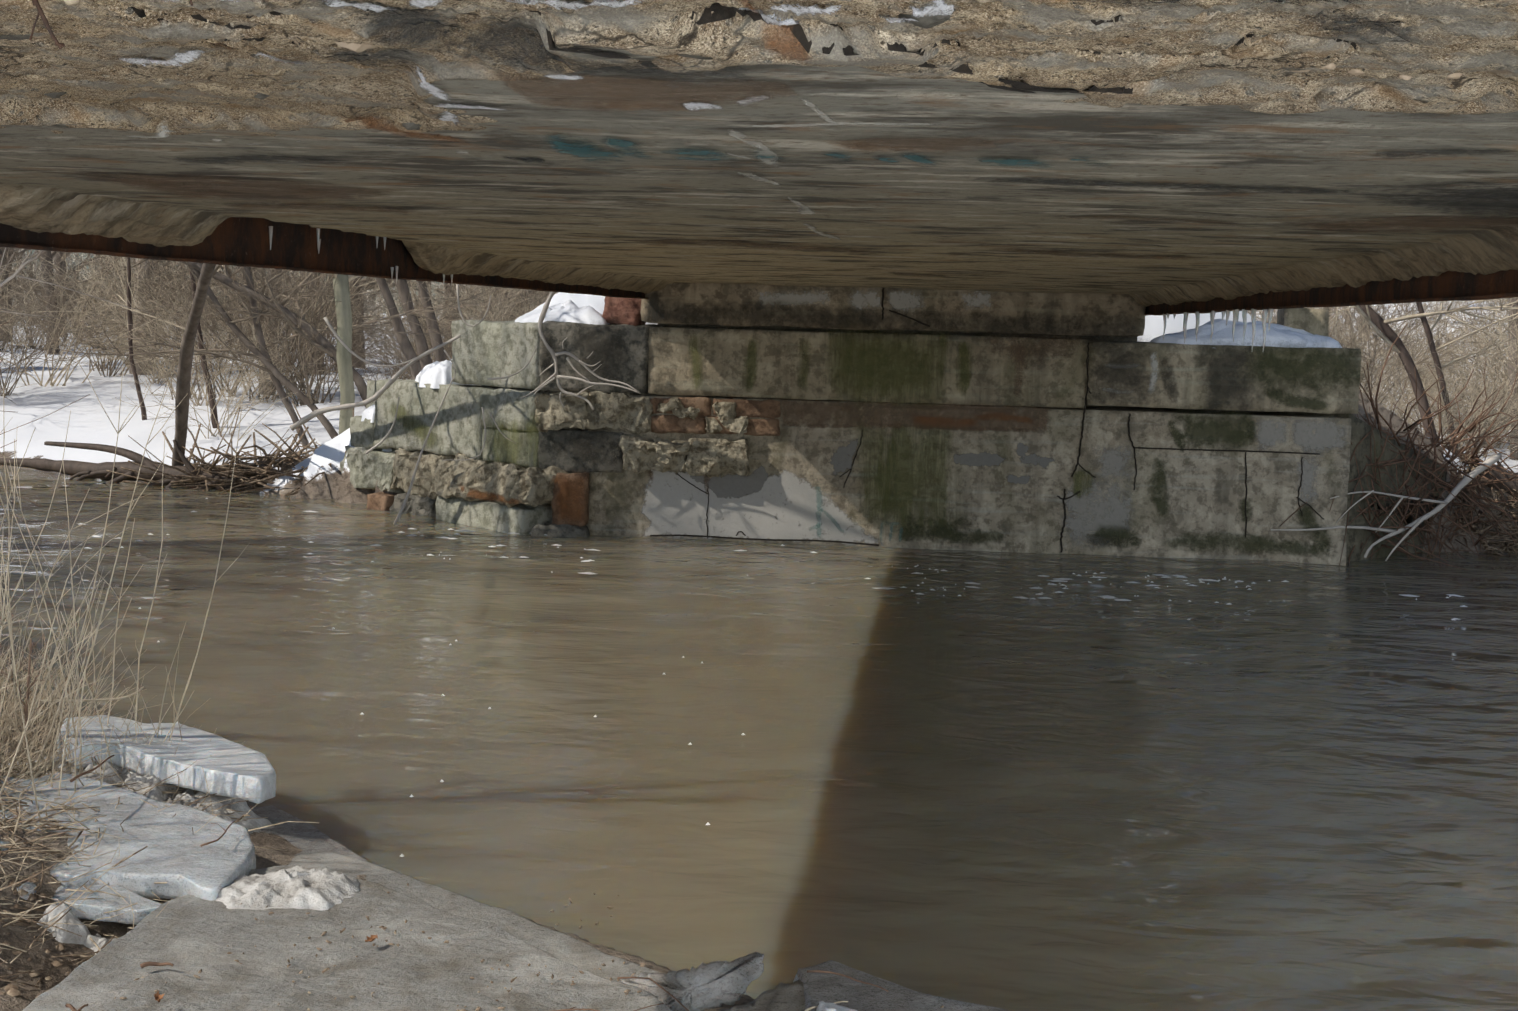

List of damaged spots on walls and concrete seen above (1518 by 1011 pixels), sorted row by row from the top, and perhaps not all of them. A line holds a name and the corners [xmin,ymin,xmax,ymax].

water stain [324,0,743,124]
water stain [684,96,769,110]
spalling [0,0,1518,139]